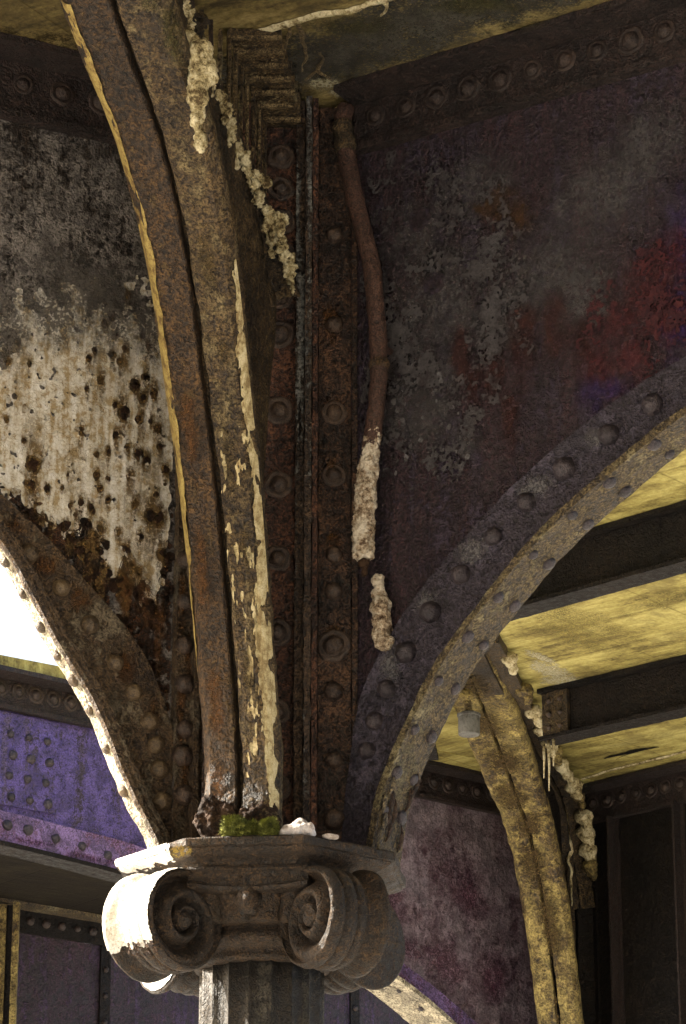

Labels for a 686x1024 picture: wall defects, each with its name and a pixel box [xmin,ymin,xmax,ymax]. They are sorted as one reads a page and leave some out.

water stain [183,0,298,295]
water stain [259,0,583,97]
corrosion [5,339,32,368]
peeling [0,0,198,672]
corrosion [21,304,170,674]
peeling [218,259,279,809]
efflorescence [351,427,395,651]
peeling [102,843,191,958]
corrosion [192,766,282,837]
corrosion [464,676,561,972]
efflorescence [501,650,686,906]